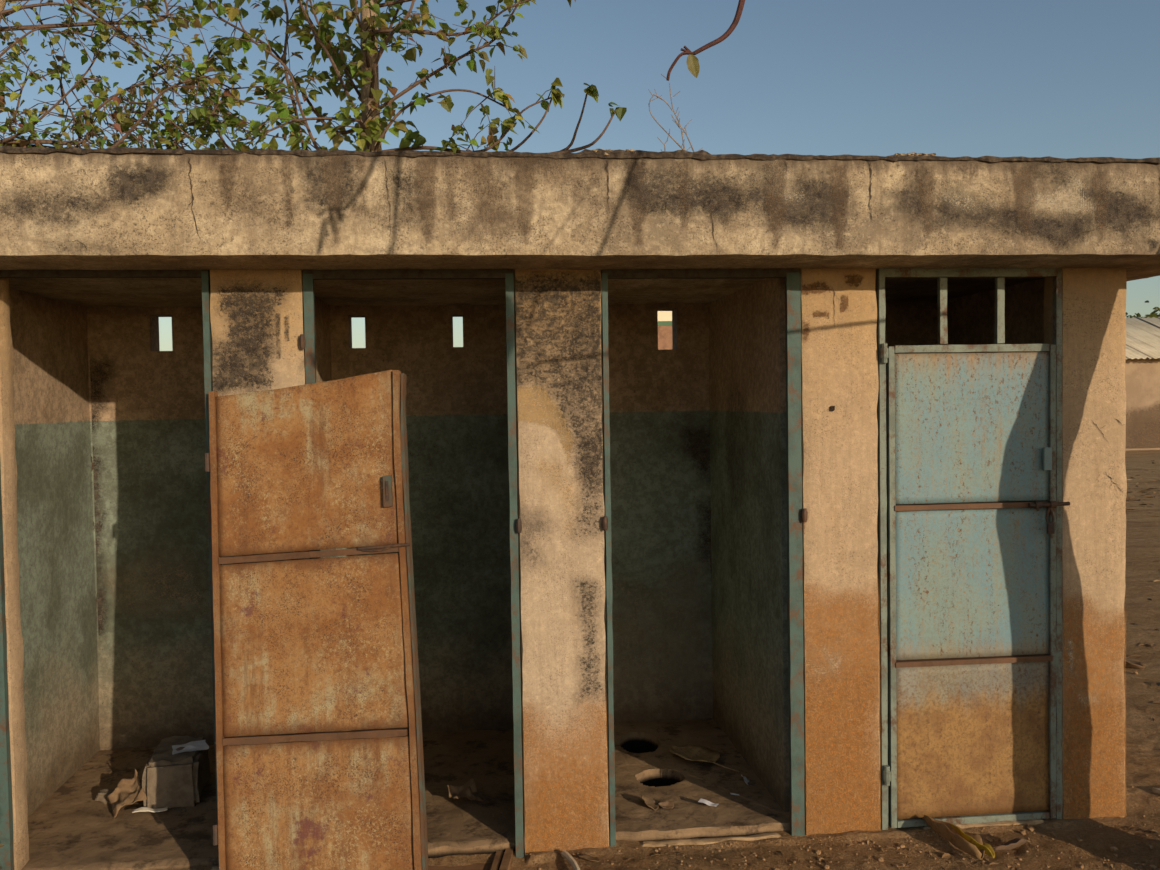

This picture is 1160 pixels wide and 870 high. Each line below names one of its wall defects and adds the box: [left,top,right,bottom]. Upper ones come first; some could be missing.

damp [0,166,171,226]
damp [283,156,366,242]
damp [382,161,436,238]
damp [620,162,849,243]
damp [895,163,1159,250]
mould [212,280,292,394]
damp [515,270,604,545]
damp [575,575,603,700]